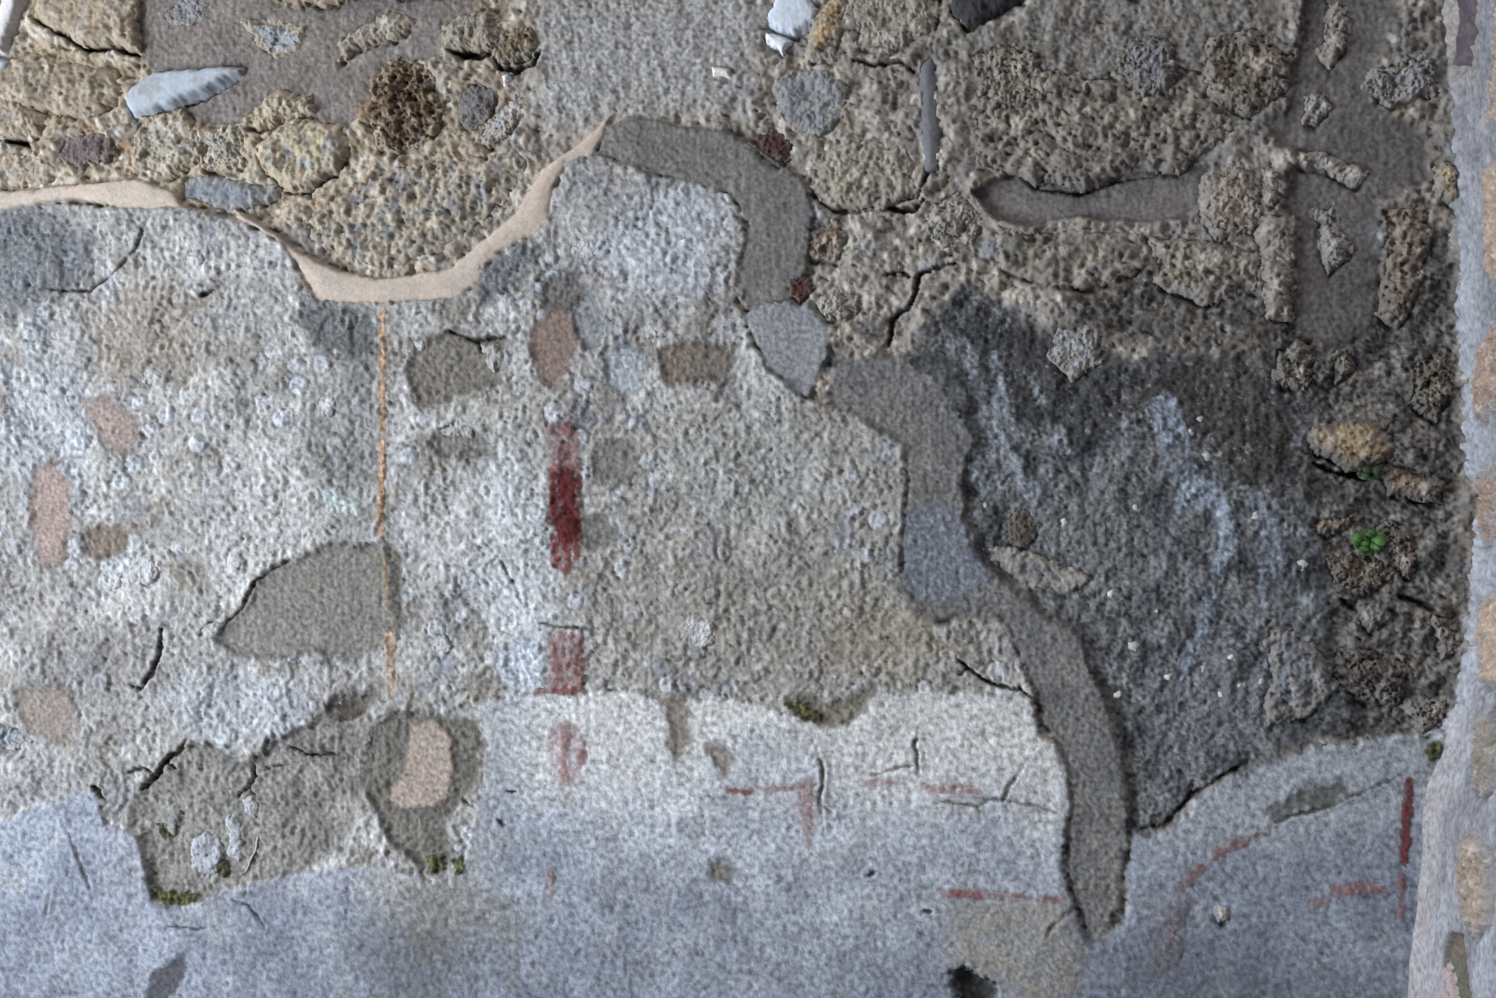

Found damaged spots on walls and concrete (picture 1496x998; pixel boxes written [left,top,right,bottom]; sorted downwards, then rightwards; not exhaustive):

peeling [0,0,29,71]
crack [46,222,144,293]
crack [887,263,956,347]
crack [199,560,290,636]
flaking render [202,541,404,662]
crack [129,628,164,690]
flaking render [130,689,484,907]
crack [873,738,919,776]
crack [936,746,1054,815]
flaking render [955,966,997,998]